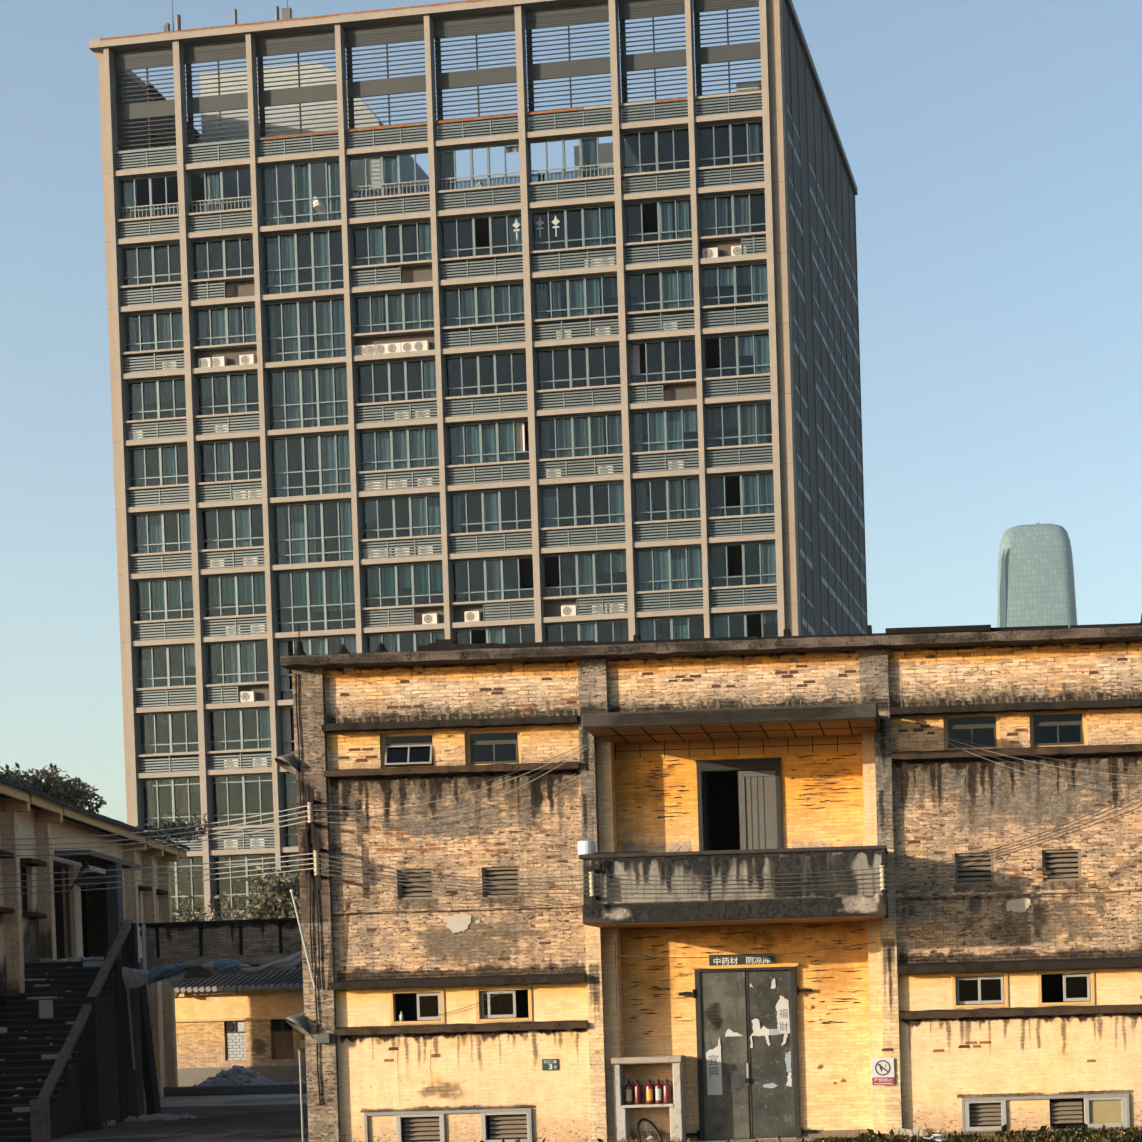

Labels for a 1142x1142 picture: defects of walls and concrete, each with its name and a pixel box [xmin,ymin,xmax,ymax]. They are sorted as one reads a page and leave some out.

leakage [301,683,1142,879]
leakage [599,842,764,894]
flaking render [998,897,1038,913]
flaking render [437,914,481,934]
leakage [883,942,1142,1008]
leakage [340,1028,587,1059]
leakage [902,1012,1142,1045]